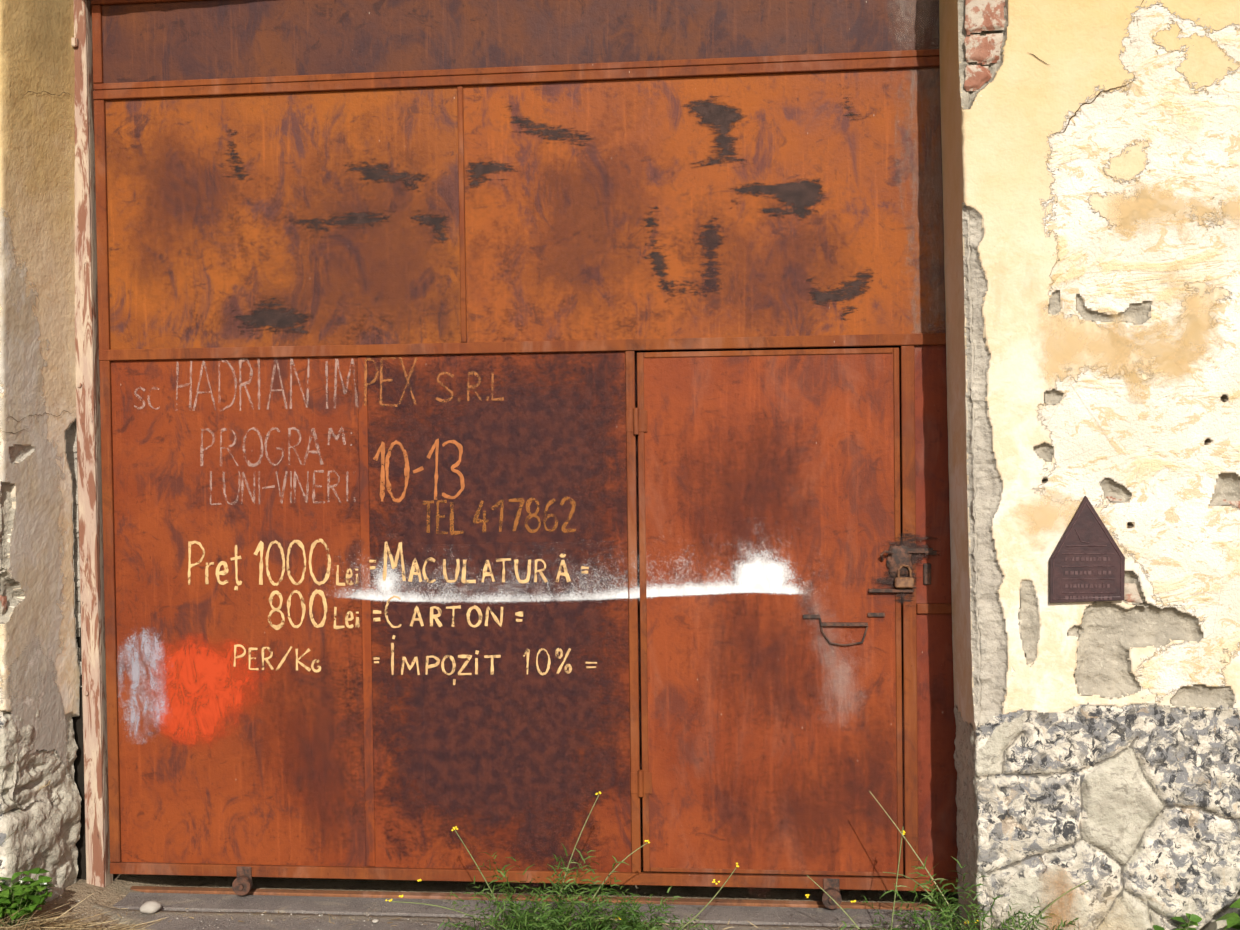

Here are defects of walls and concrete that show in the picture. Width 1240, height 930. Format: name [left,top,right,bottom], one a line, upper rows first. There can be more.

spalling [958,0,1008,109]
rust [466,161,514,188]
rust [508,106,592,146]
rust [683,96,744,166]
rust [732,179,824,218]
rust [233,298,311,339]
rust [644,207,723,297]
rust [806,273,873,320]
peeling [1033,0,1240,709]
flaking render [0,207,82,810]
spalling [962,202,1040,728]
rust [352,352,640,871]